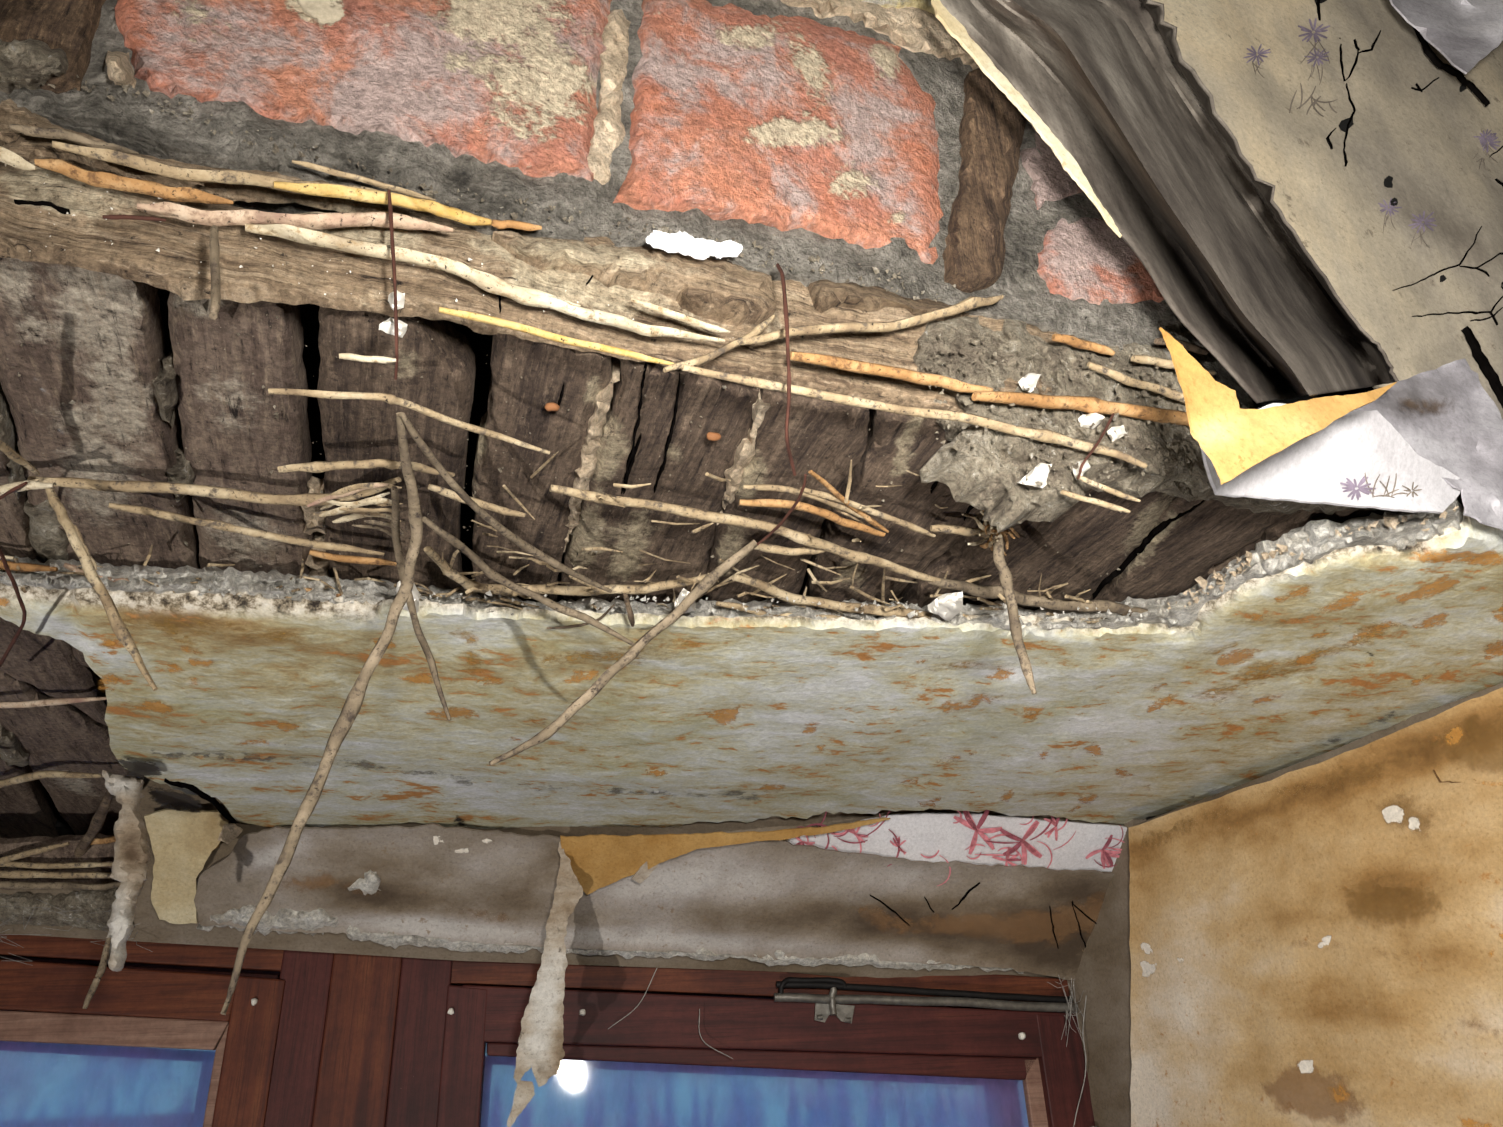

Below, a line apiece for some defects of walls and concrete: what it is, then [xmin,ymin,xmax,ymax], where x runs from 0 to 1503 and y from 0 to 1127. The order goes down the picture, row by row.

peeling [379,291,408,338]
peeling [781,0,1399,488]
crack [1316,0,1490,167]
crack [1392,226,1503,408]
crack [1489,146,1503,187]
spalling [0,498,1463,631]
peeling [507,840,583,1127]